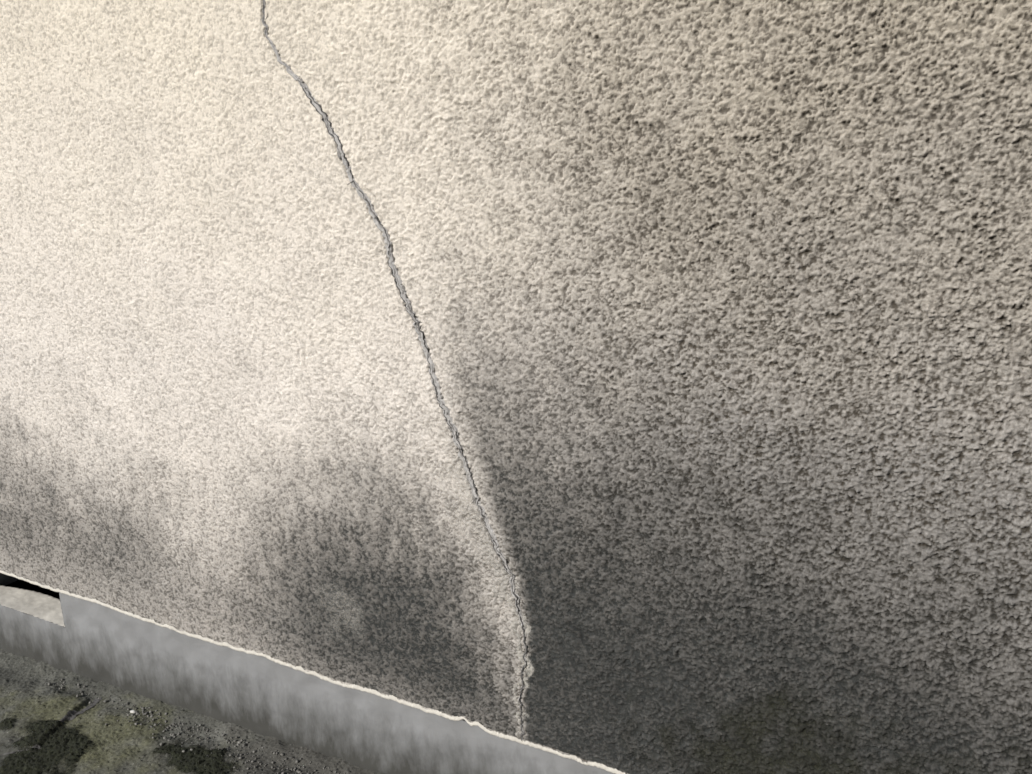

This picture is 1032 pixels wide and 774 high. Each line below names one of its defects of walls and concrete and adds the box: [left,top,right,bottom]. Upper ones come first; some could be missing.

crack [262,0,528,741]